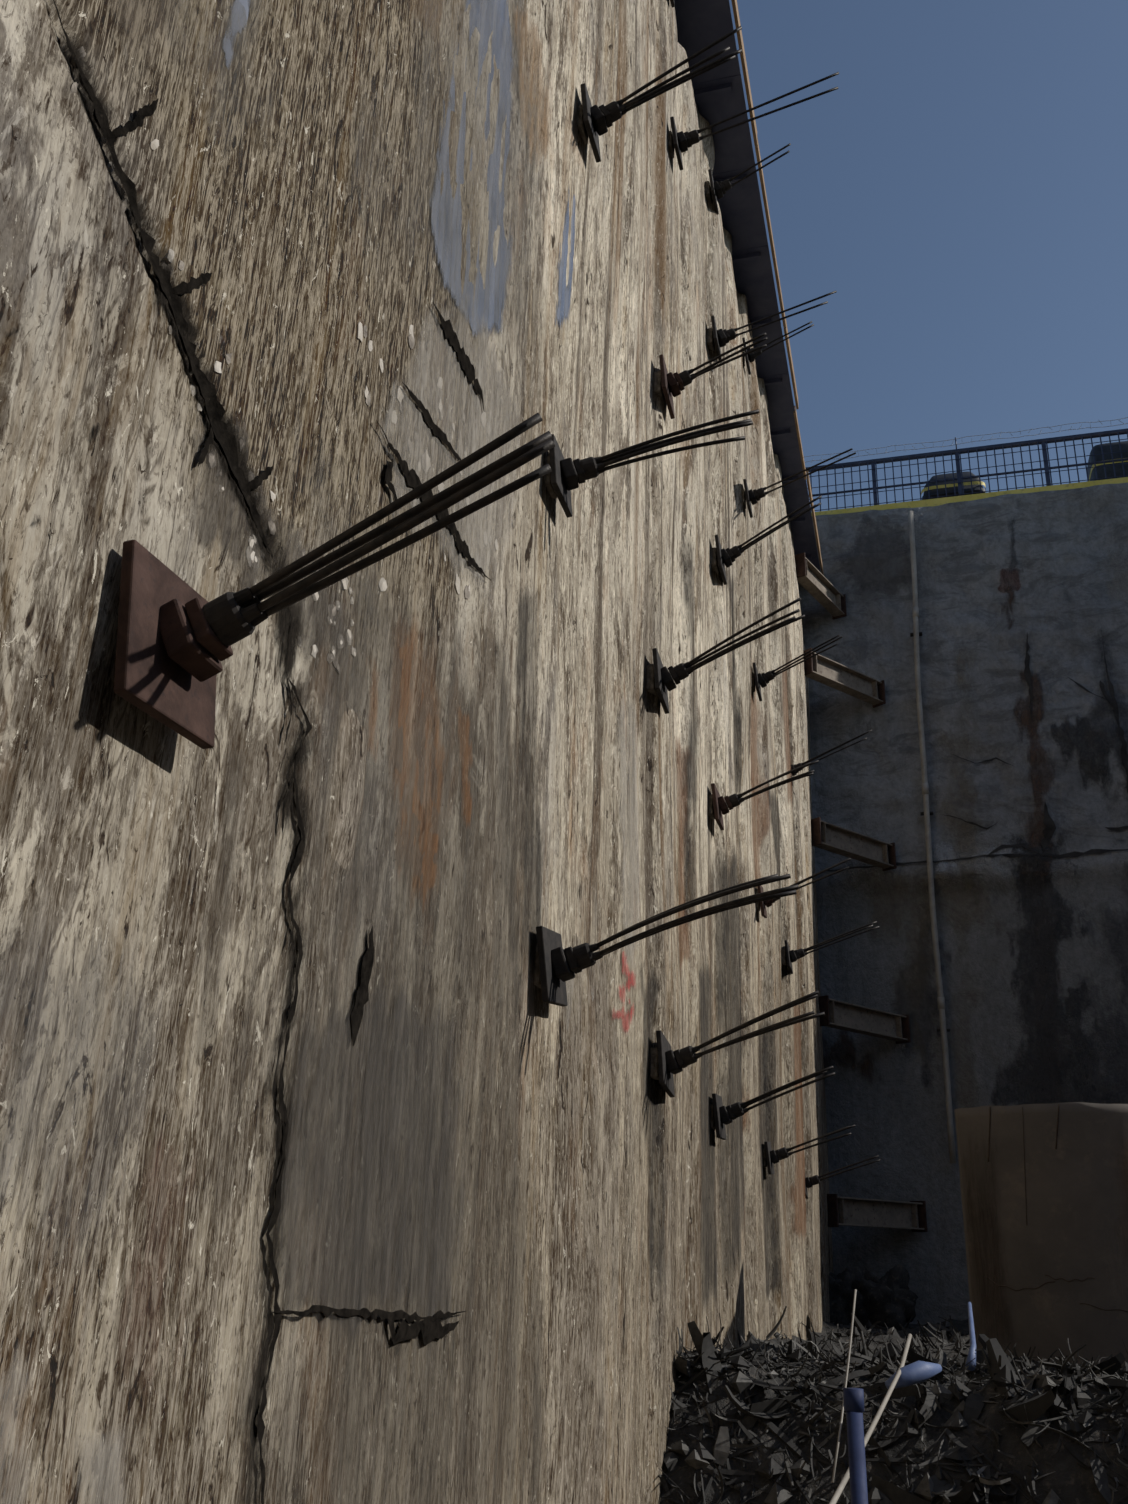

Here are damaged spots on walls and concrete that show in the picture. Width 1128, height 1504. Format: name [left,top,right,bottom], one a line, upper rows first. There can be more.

crack [53,0,312,1504]
crack [824,630,1128,871]
rust [998,520,1056,885]
damp [1051,716,1117,788]
damp [991,836,1128,1106]